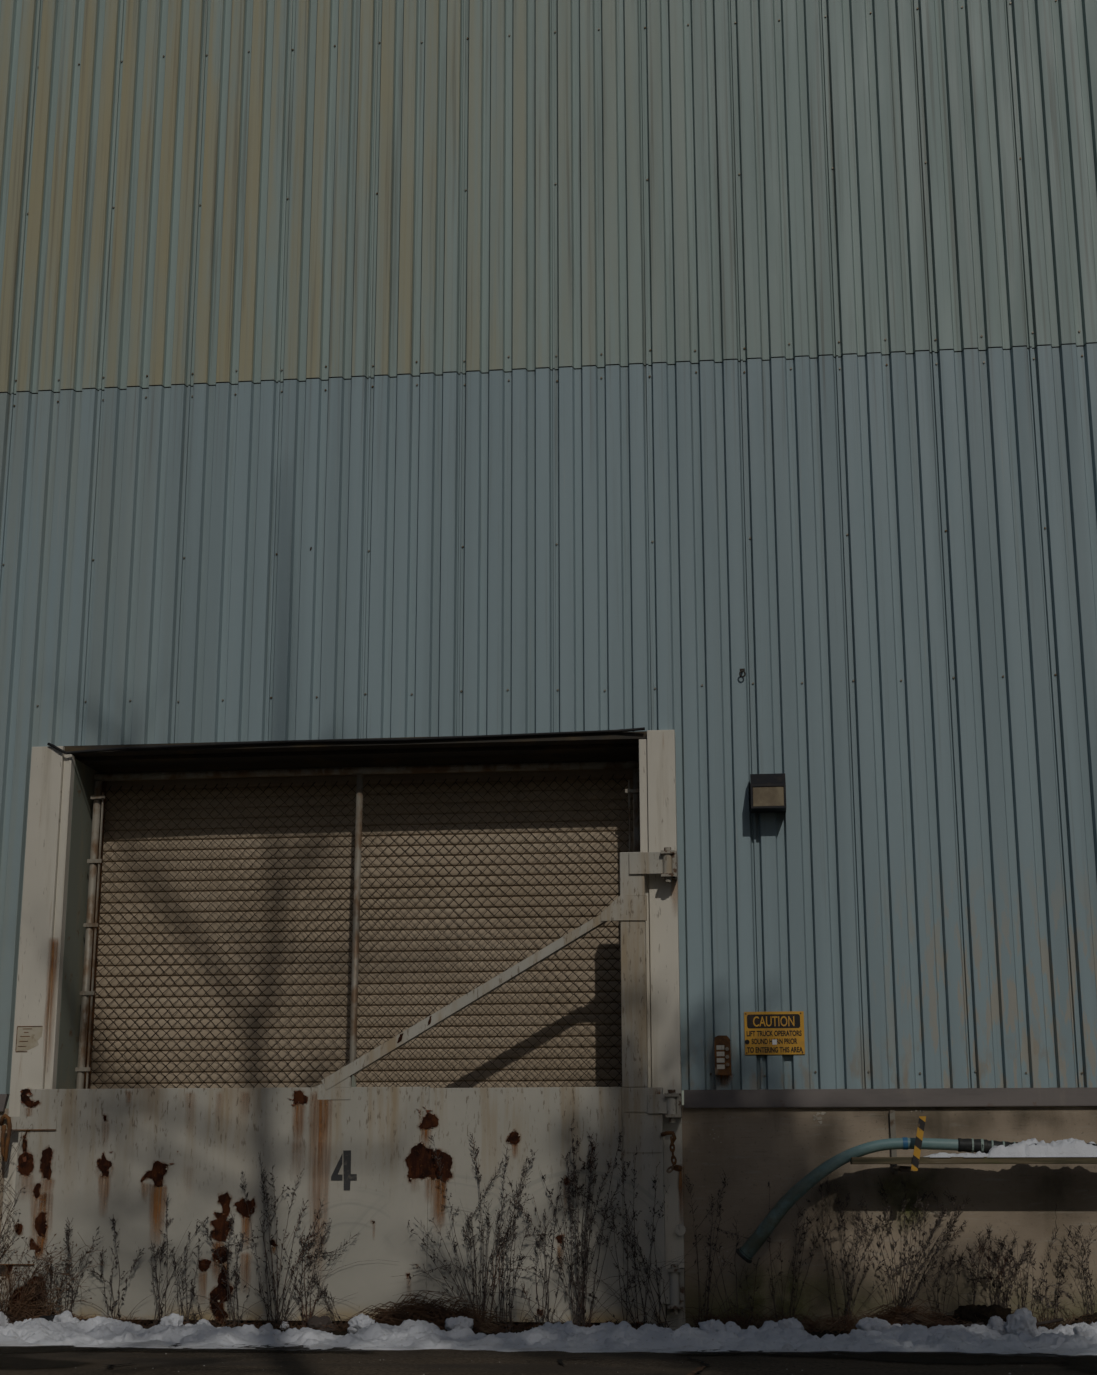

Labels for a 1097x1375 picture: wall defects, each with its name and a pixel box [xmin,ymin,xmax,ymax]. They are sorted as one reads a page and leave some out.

rust [20,1089,40,1107]
rust [14,1130,53,1256]
rust [97,1152,112,1195]
rust [140,1151,178,1230]
rust [290,1090,327,1176]
rust [405,1107,453,1209]
rust [506,1129,520,1153]
rust [198,1192,255,1324]